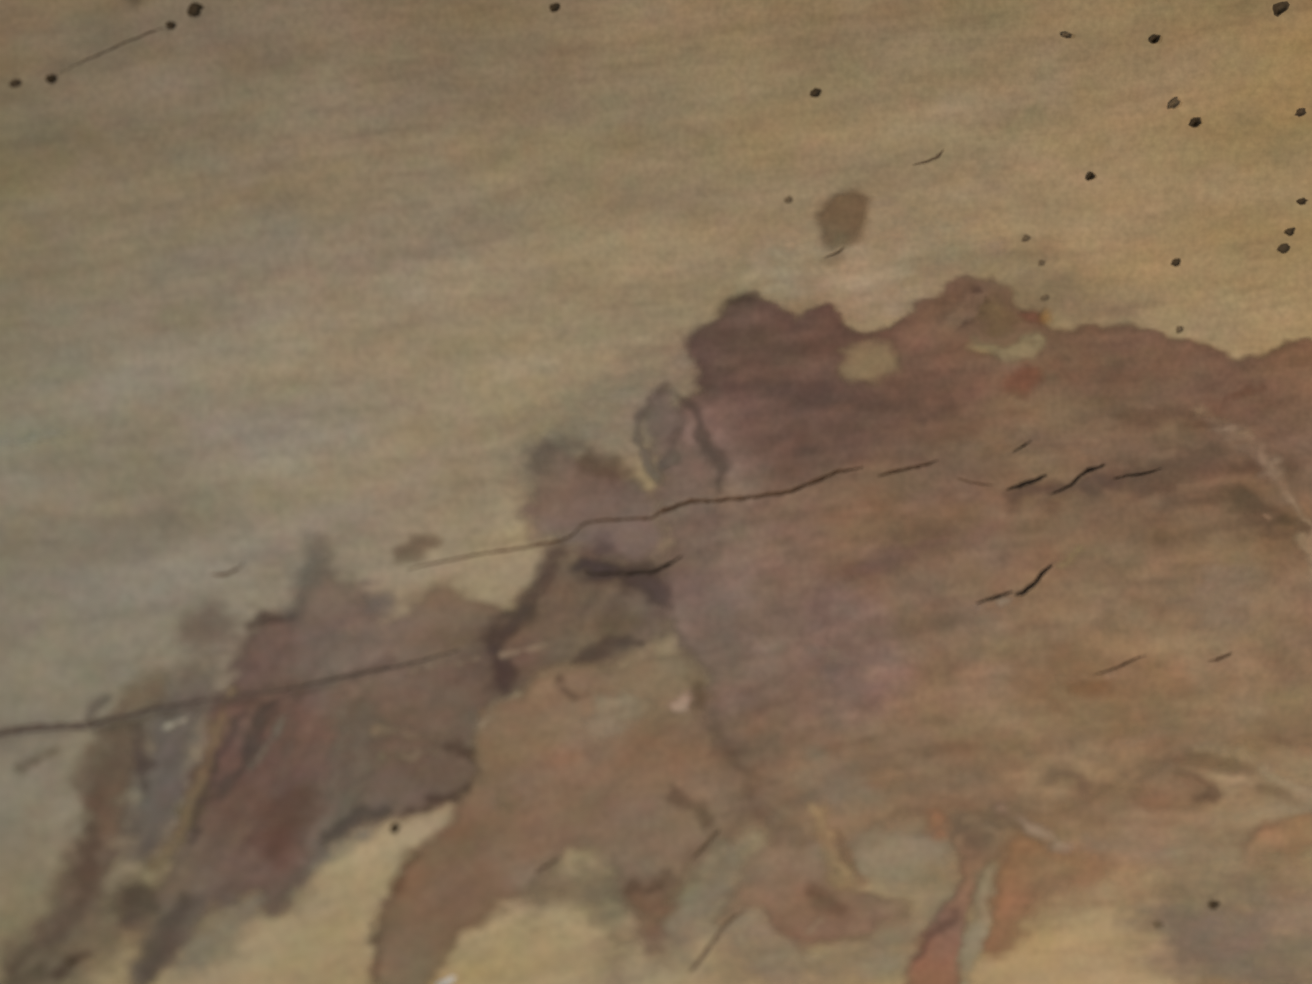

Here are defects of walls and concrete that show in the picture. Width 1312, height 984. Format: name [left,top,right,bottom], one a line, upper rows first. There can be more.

water stain [741,193,932,317]
crack [584,556,683,576]
water stain [6,276,1312,984]
crack [408,440,1161,570]
crack [977,564,1052,604]
crack [0,649,460,736]